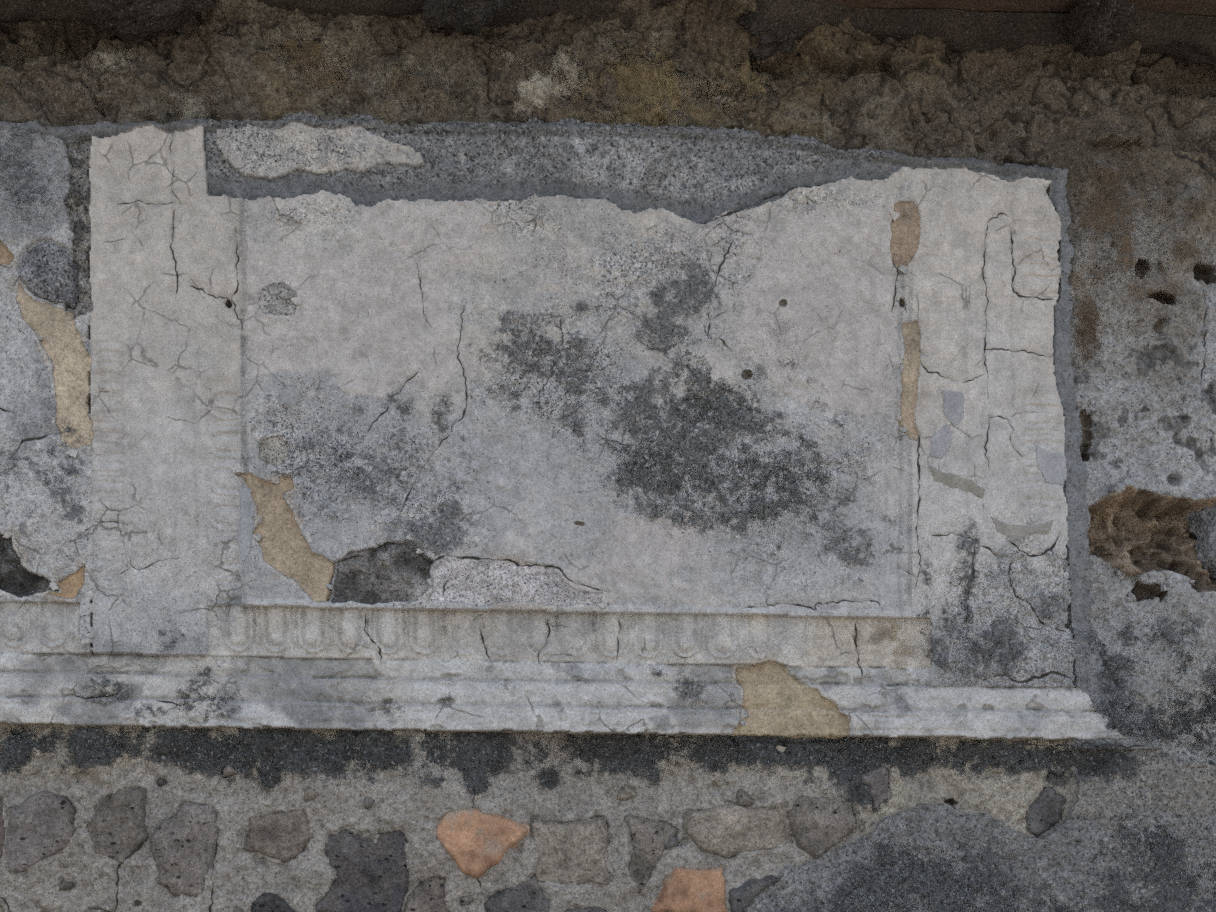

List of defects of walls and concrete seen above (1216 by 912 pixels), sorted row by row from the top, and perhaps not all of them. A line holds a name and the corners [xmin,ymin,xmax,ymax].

crack [121,141,242,323]
peeling [889,201,920,274]
spalling [0,531,85,599]
spalling [231,437,607,608]
crack [337,253,621,662]
leakage [0,610,1216,830]
leakage [471,257,904,584]
peeling [730,661,850,753]
crack [742,598,880,675]
crack [900,435,1066,632]
crack [921,213,1054,461]
spalling [1087,483,1216,592]